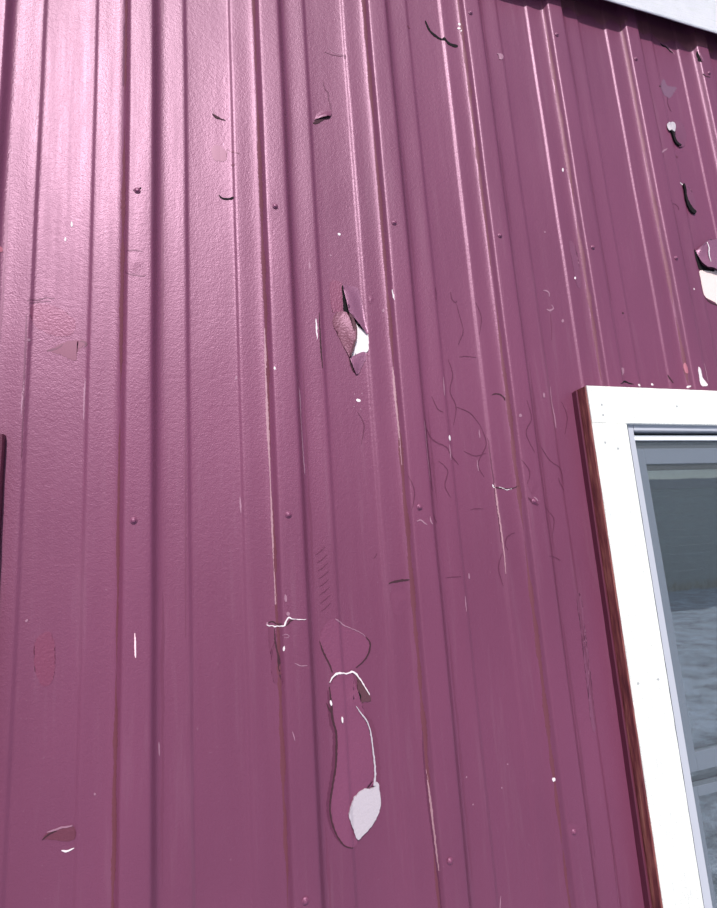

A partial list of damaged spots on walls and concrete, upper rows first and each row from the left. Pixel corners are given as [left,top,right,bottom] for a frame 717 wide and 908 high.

peeling [693,270,717,304]
peeling [351,324,369,357]
peeling [683,363,708,388]
crack [267,617,306,678]
peeling [348,782,381,840]